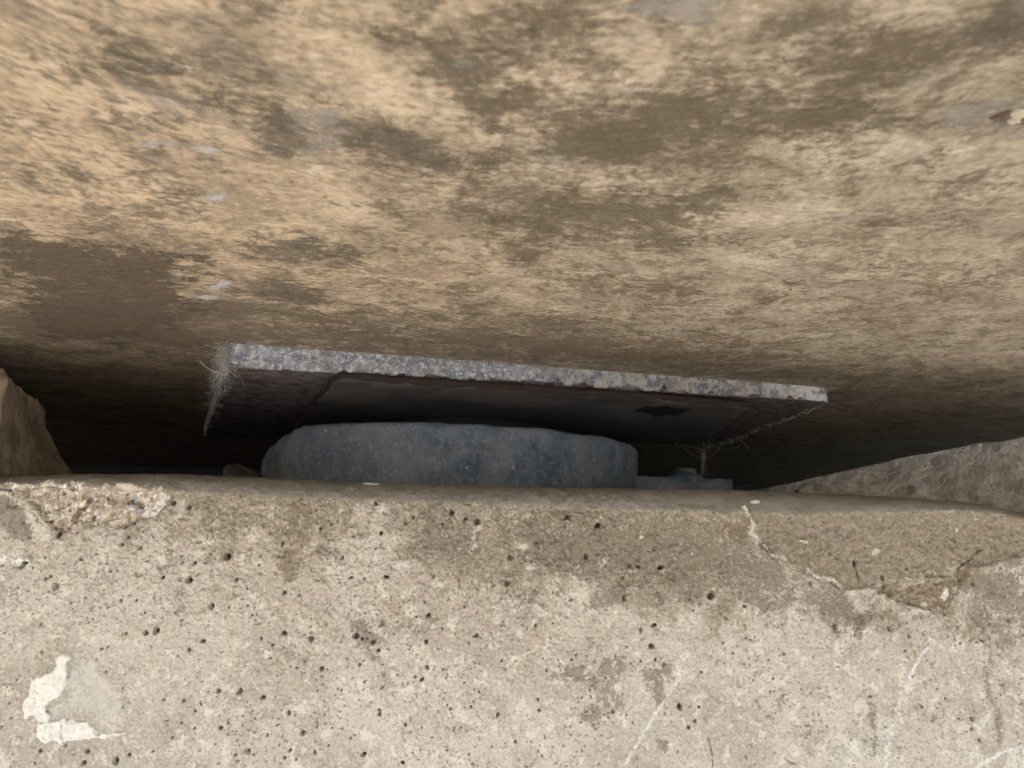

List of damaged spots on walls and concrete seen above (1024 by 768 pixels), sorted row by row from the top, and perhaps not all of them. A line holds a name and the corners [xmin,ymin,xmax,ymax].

leakage [87,22,176,77]
leakage [255,105,308,158]
leakage [335,120,489,177]
leakage [418,2,586,134]
leakage [527,4,910,178]
leakage [0,230,233,347]
leakage [237,231,360,269]
leakage [488,185,740,267]
leakage [714,247,790,269]
spalling [0,479,176,548]
crack [742,505,859,591]
peeling [22,651,126,744]